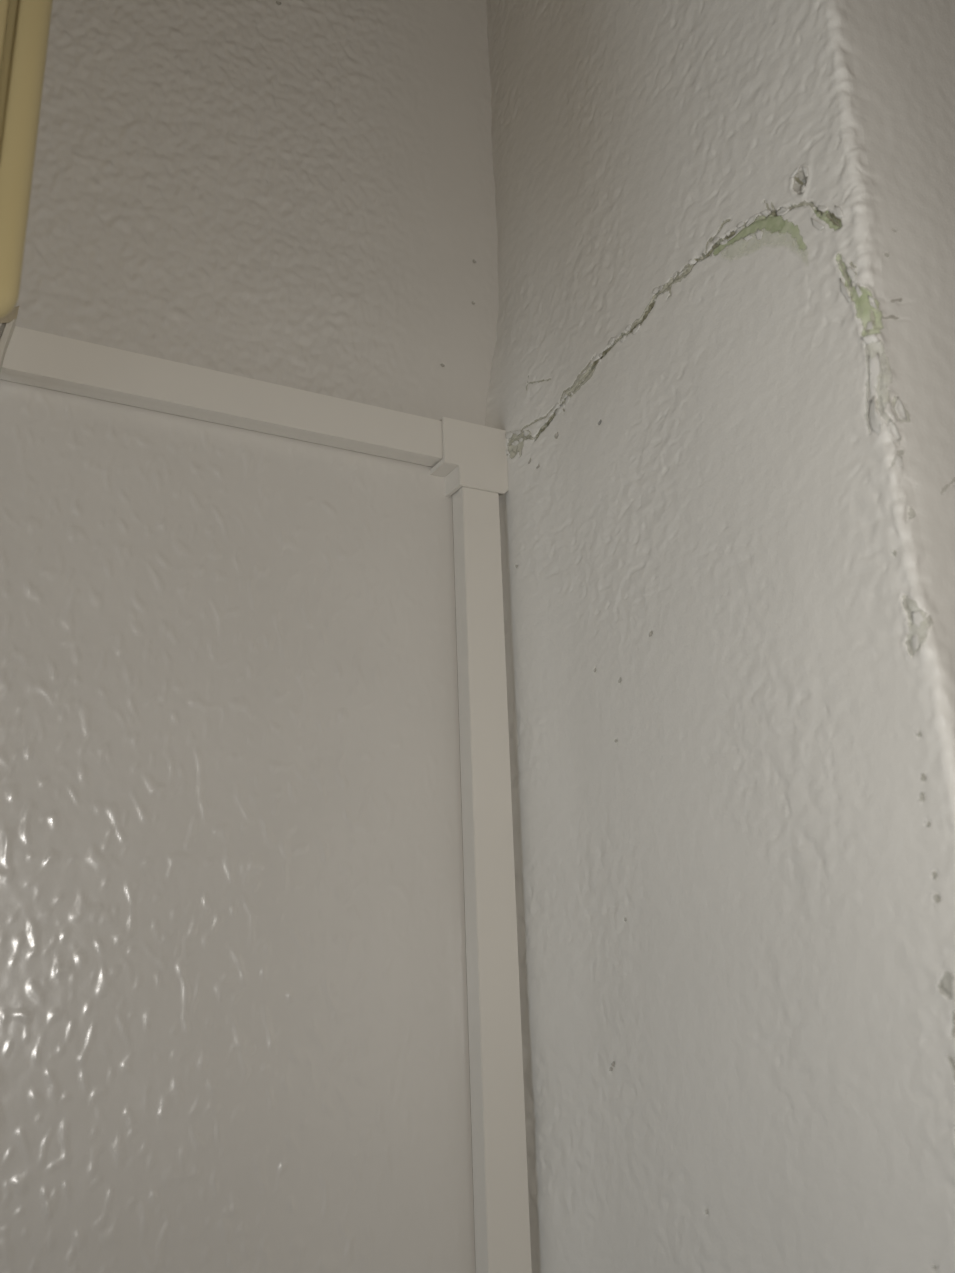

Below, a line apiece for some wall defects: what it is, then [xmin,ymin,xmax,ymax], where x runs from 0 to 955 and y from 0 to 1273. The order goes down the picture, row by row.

crack [508,177,840,450]
spalling [836,254,910,468]
spalling [903,595,933,656]